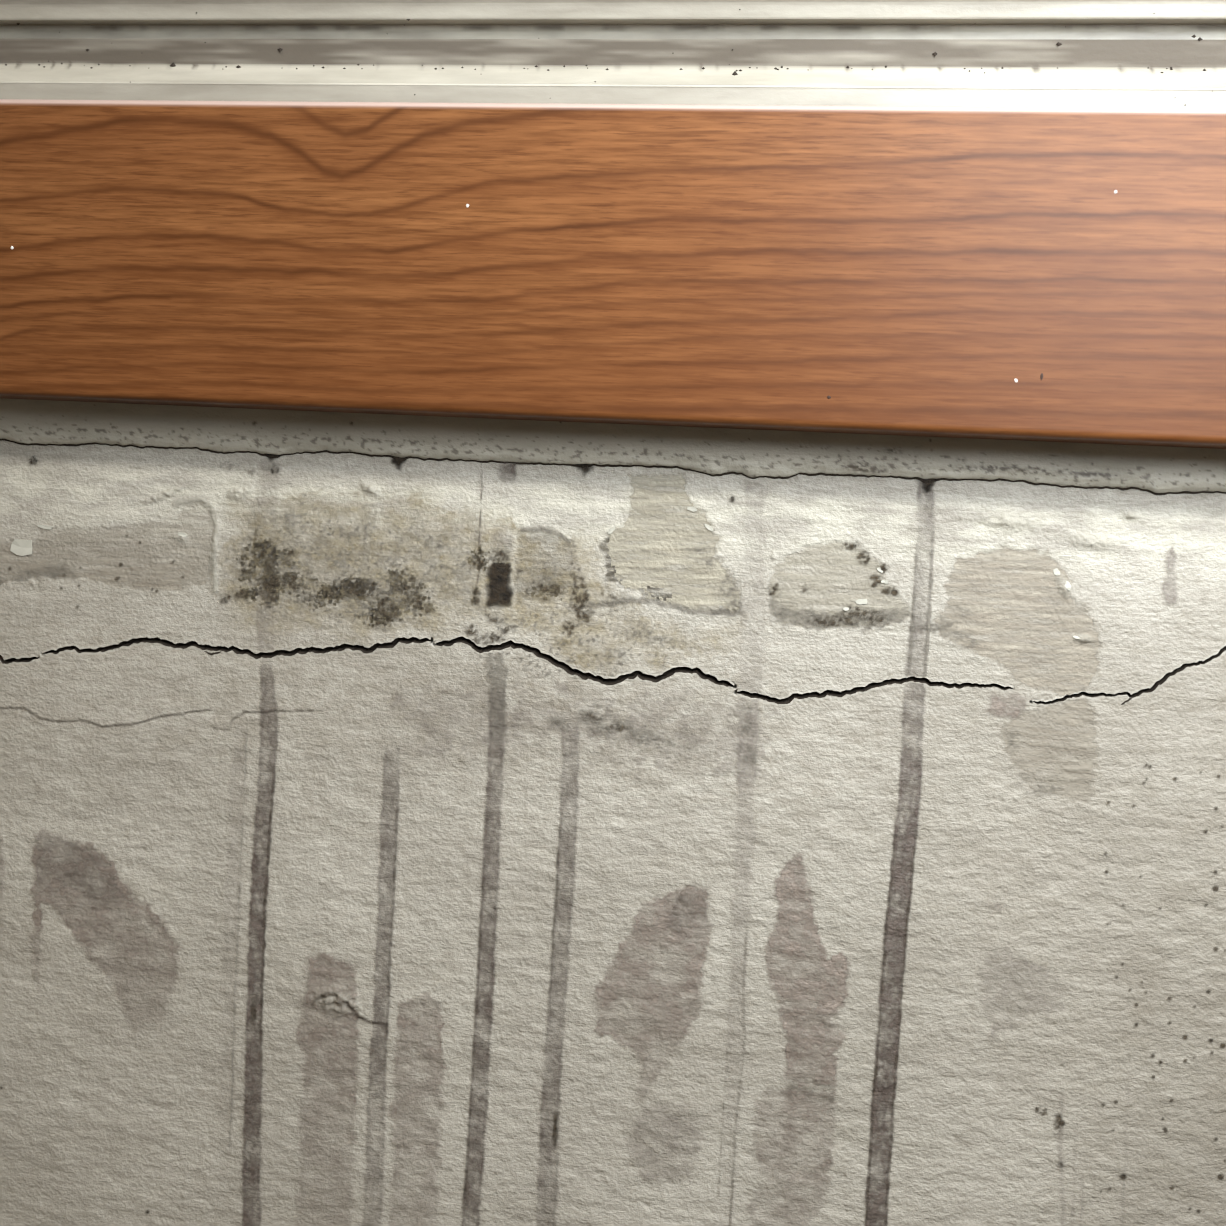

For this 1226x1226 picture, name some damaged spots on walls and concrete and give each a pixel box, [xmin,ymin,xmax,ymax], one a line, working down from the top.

water stain [467,562,599,709]
crack [0,634,1226,707]
peeling [588,474,742,616]
peeling [769,543,907,630]
water stain [30,842,178,977]
water stain [242,678,277,1226]
water stain [297,953,446,1104]
water stain [475,775,500,1029]
water stain [595,885,709,1060]
water stain [767,855,849,1144]
water stain [865,746,922,1226]
water stain [463,1095,487,1226]